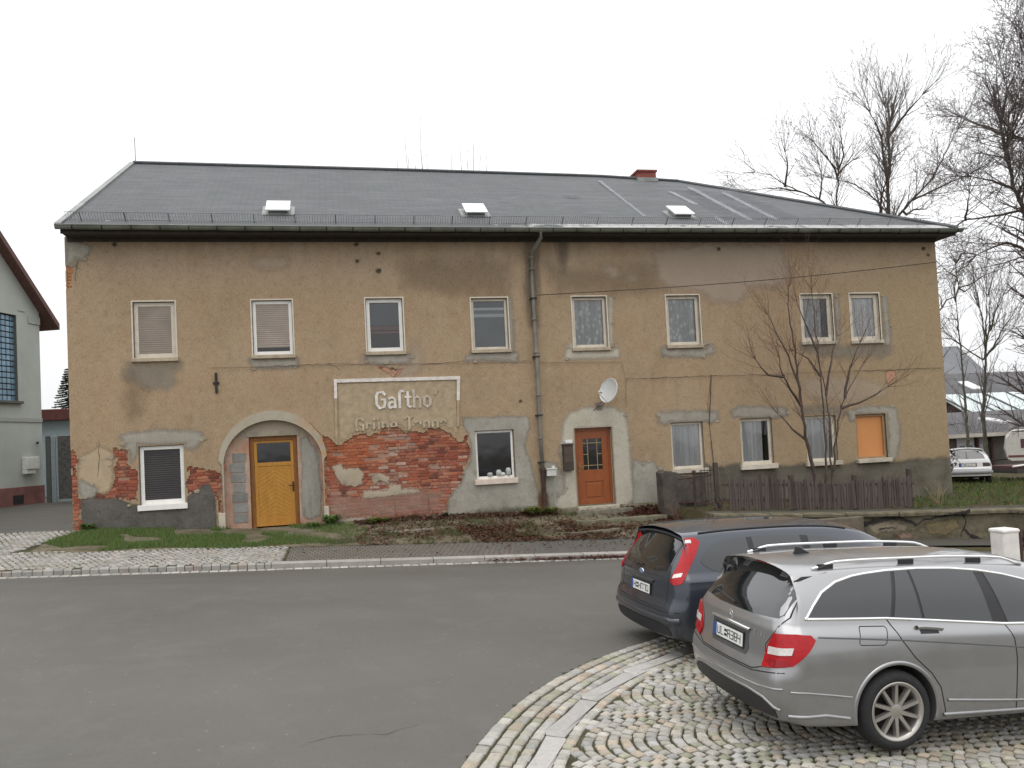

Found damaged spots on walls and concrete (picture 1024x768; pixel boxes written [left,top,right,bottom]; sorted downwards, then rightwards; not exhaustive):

flaking render [71,446,139,530]
flaking render [185,458,226,513]
flaking render [316,427,472,523]
crack [864,509,983,539]